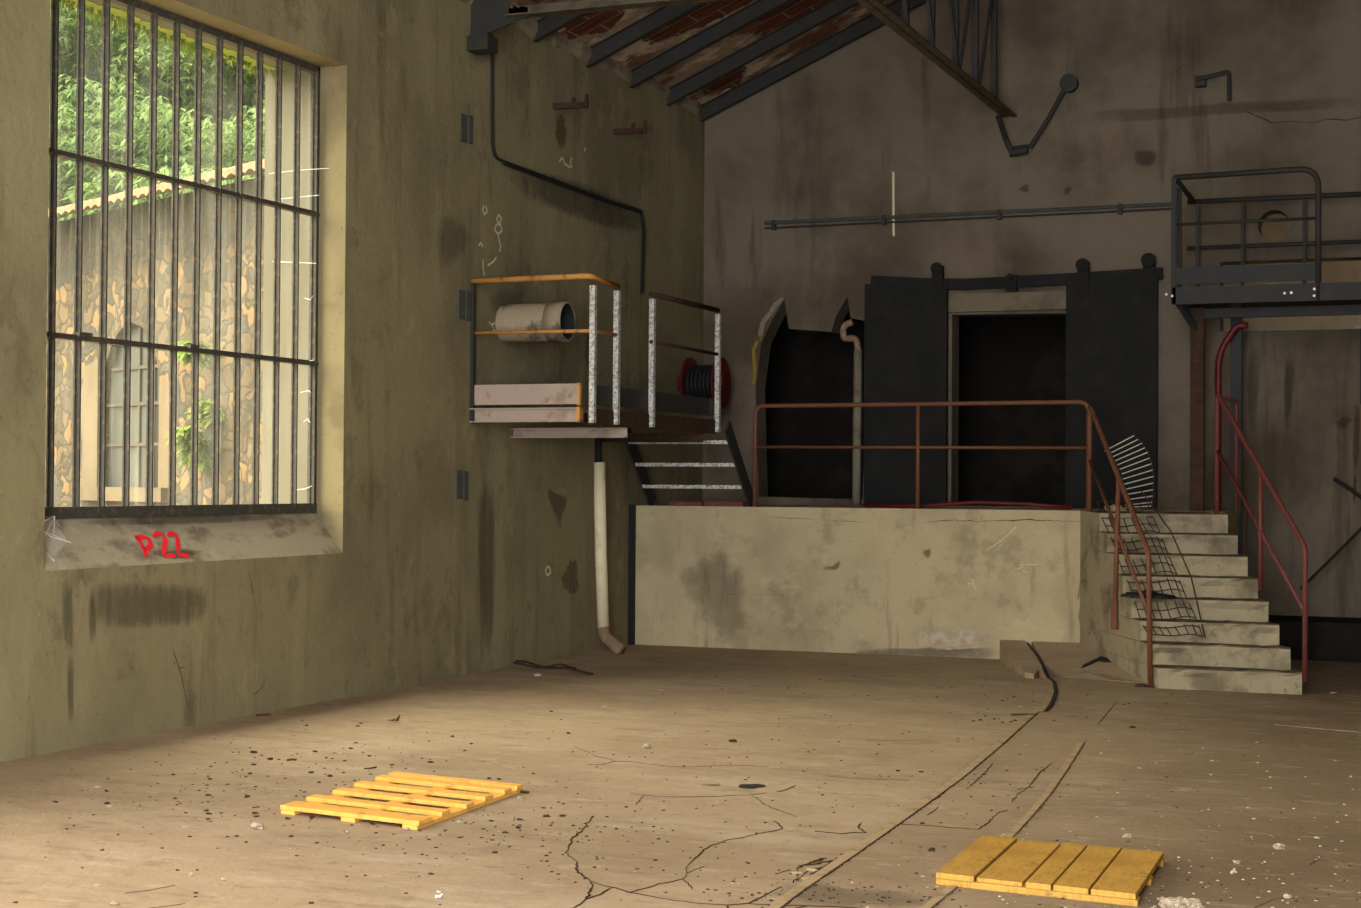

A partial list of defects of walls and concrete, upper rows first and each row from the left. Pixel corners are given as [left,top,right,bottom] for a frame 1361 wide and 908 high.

crack [565,746,867,908]
crack [901,763,1052,829]